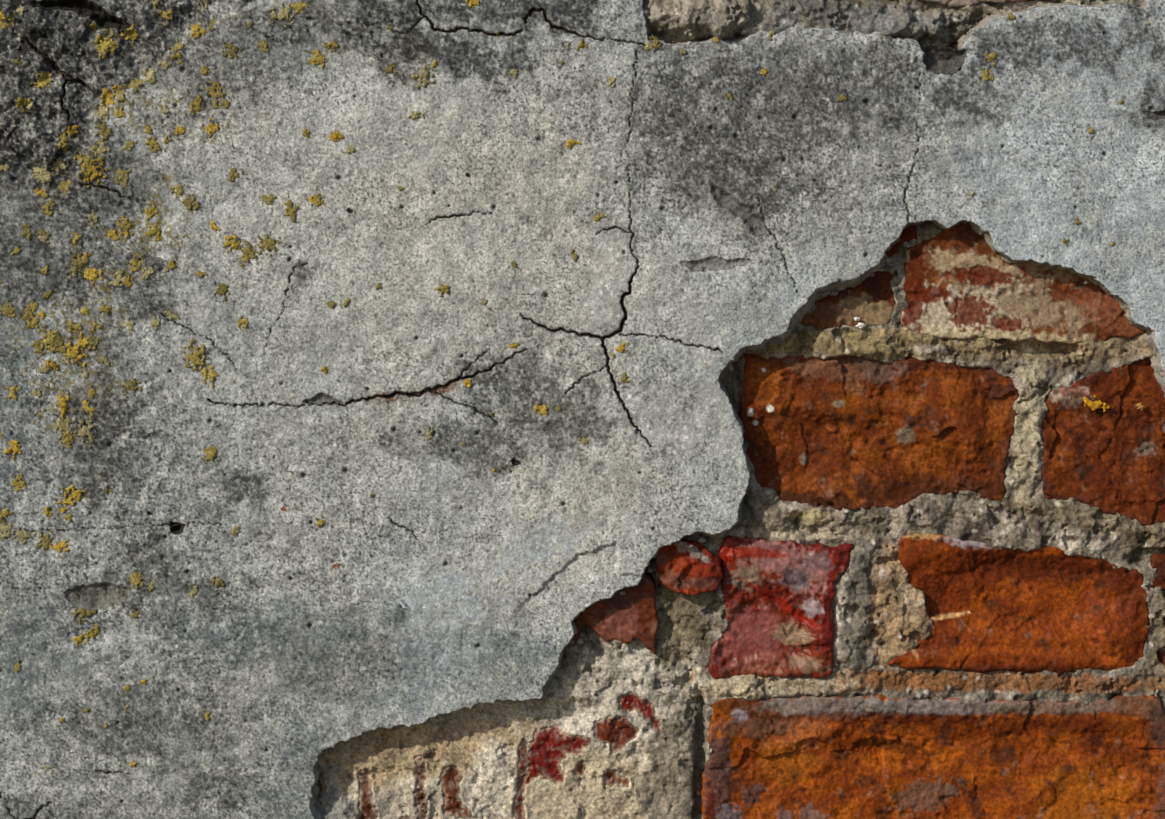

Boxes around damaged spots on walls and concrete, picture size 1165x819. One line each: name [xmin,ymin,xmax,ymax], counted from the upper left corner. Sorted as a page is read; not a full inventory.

spalling [643,0,759,46]
spalling [956,0,1148,50]
crack [25,37,94,130]
crack [208,0,723,447]
crack [758,203,798,293]
peeling [302,393,343,405]
spalling [410,220,1165,727]
spalling [310,732,365,819]
peeling [358,768,378,819]
peeling [400,756,472,819]
peeling [513,692,661,819]